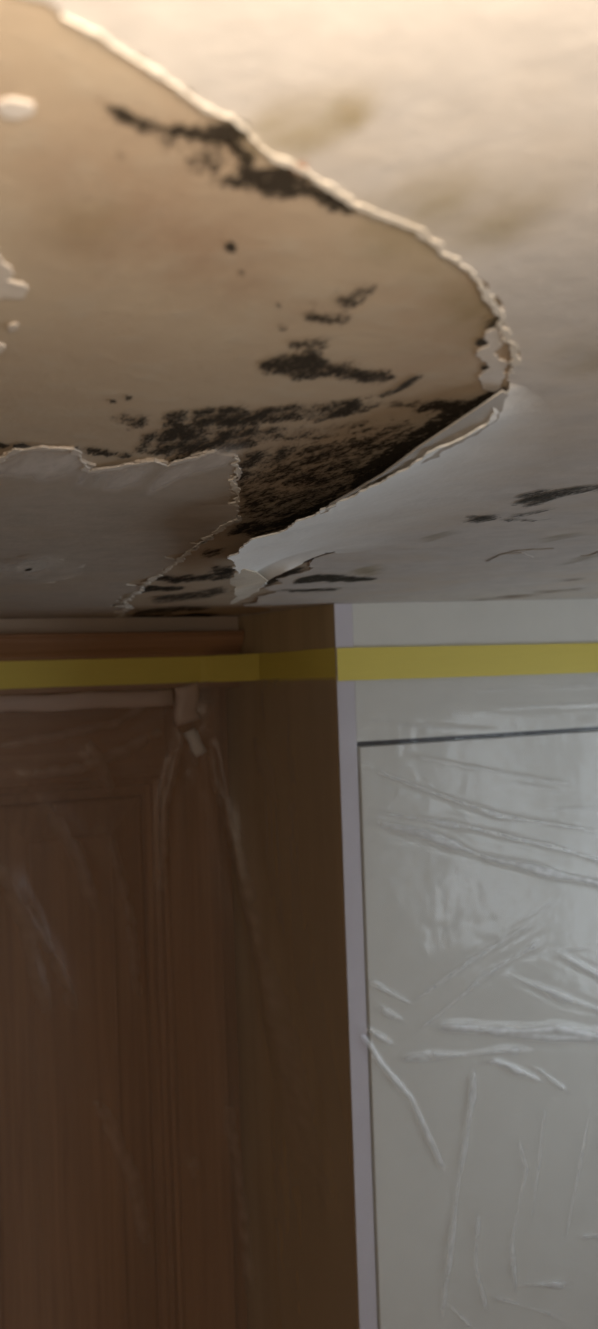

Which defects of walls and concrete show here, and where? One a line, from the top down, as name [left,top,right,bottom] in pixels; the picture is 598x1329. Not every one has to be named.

damp [99,98,356,215]
damp [0,285,507,617]
peeling [0,0,558,618]
damp [458,486,598,524]